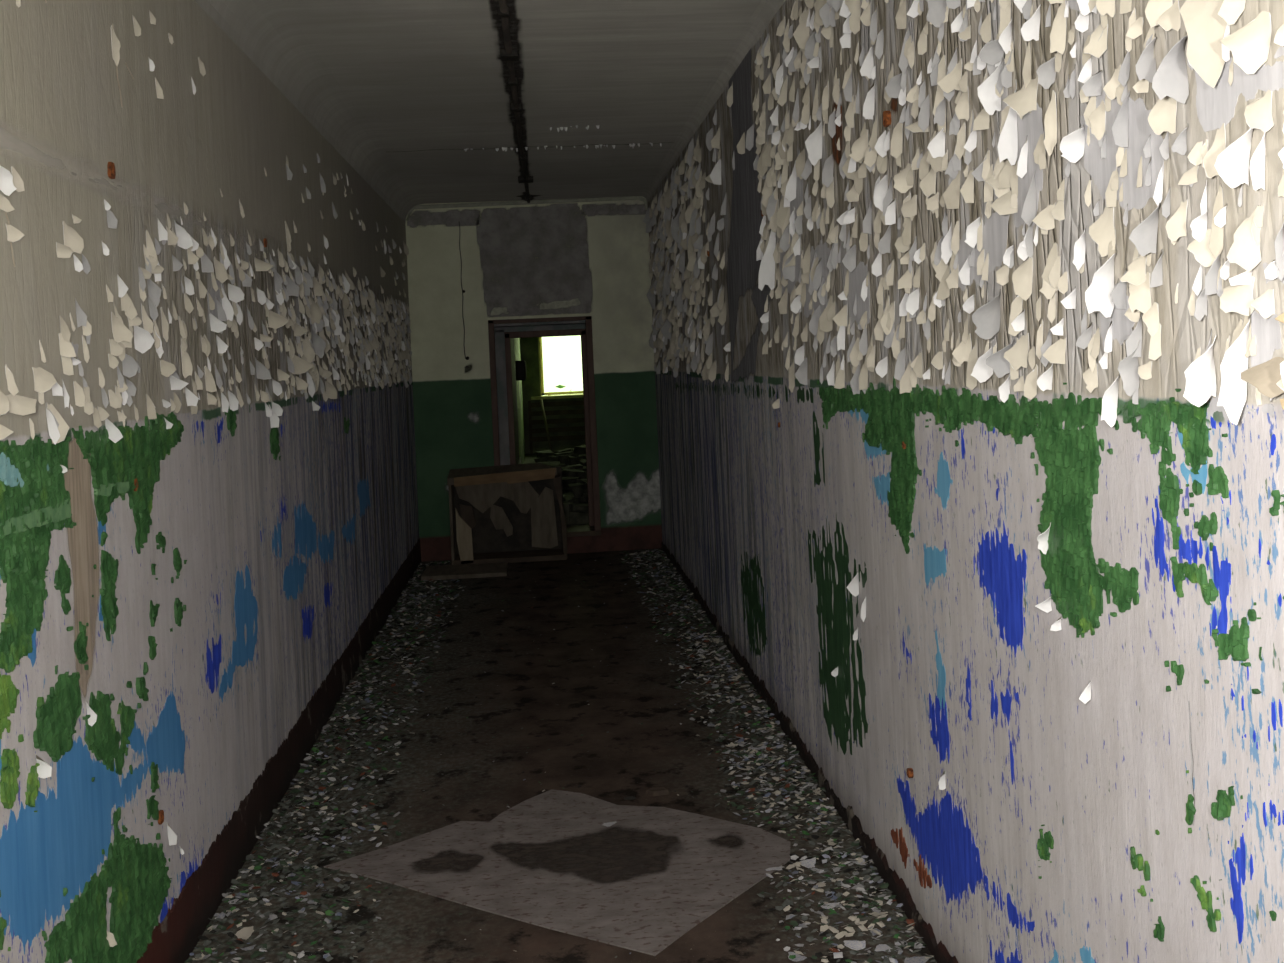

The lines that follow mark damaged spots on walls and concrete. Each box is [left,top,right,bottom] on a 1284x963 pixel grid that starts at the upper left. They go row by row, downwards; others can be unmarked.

peeling [111,25,120,66]
peeling [133,11,174,44]
peeling [149,58,164,99]
peeling [191,58,206,95]
peeling [407,0,1284,755]
peeling [891,630,1035,933]
peeling [1037,824,1054,879]
peeling [1185,784,1284,944]
peeling [1130,846,1165,942]
peeling [844,940,930,963]
peeling [990,940,1022,963]
peeling [1080,946,1095,963]